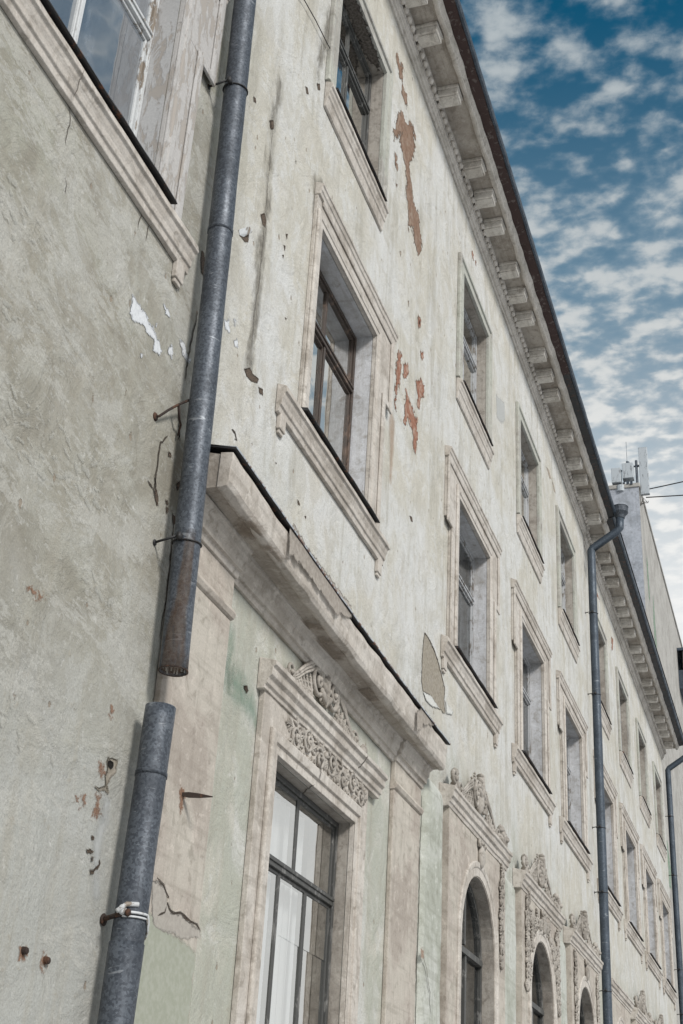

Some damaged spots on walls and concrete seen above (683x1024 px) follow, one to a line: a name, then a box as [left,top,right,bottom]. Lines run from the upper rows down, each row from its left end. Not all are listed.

flaking render [393,53,423,255]
crack [199,251,207,274]
peeling [129,294,191,363]
crack [185,312,198,380]
flaking render [394,349,425,454]
crack [148,433,180,638]
flaking render [417,633,454,733]
rust [75,792,102,820]
crack [152,877,201,940]